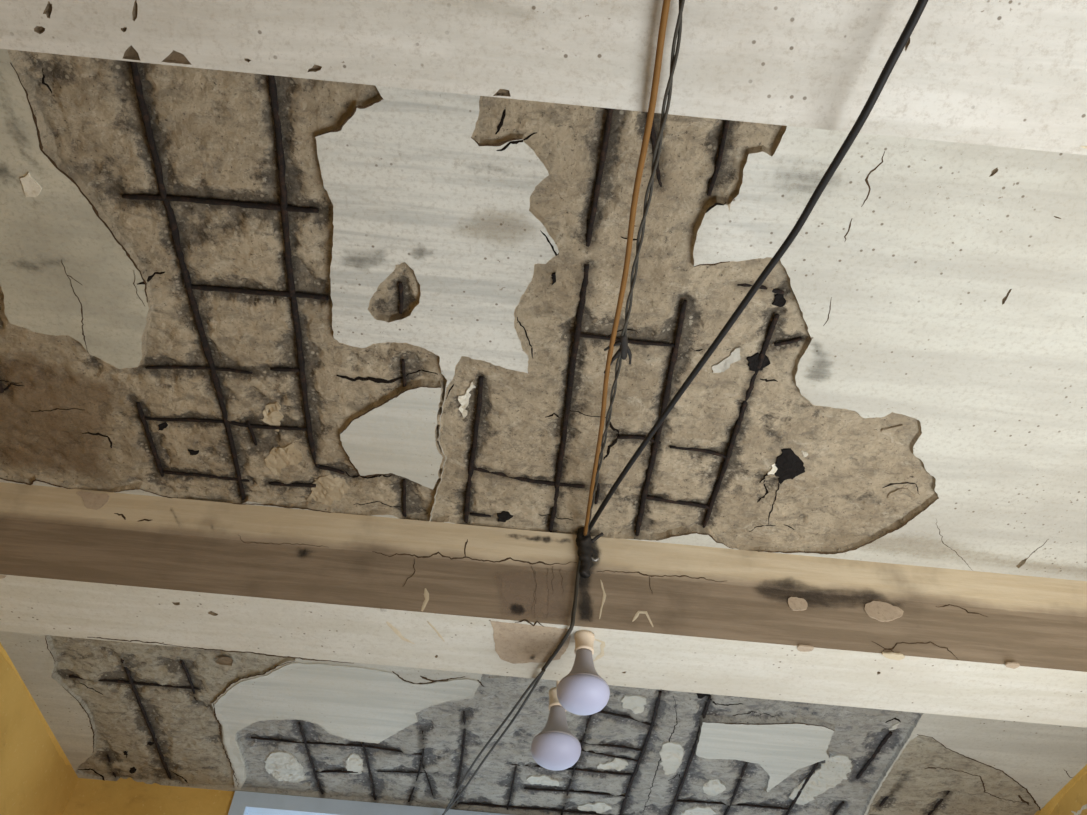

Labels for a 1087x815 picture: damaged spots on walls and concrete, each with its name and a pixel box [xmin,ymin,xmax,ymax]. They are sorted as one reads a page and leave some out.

peeling [34,1,52,34]
peeling [121,0,138,32]
crack [844,151,885,241]
spalling [0,45,939,555]
crack [372,539,724,627]
water stain [760,581,880,606]
spalling [46,574,1041,815]
crack [1071,804,1087,815]